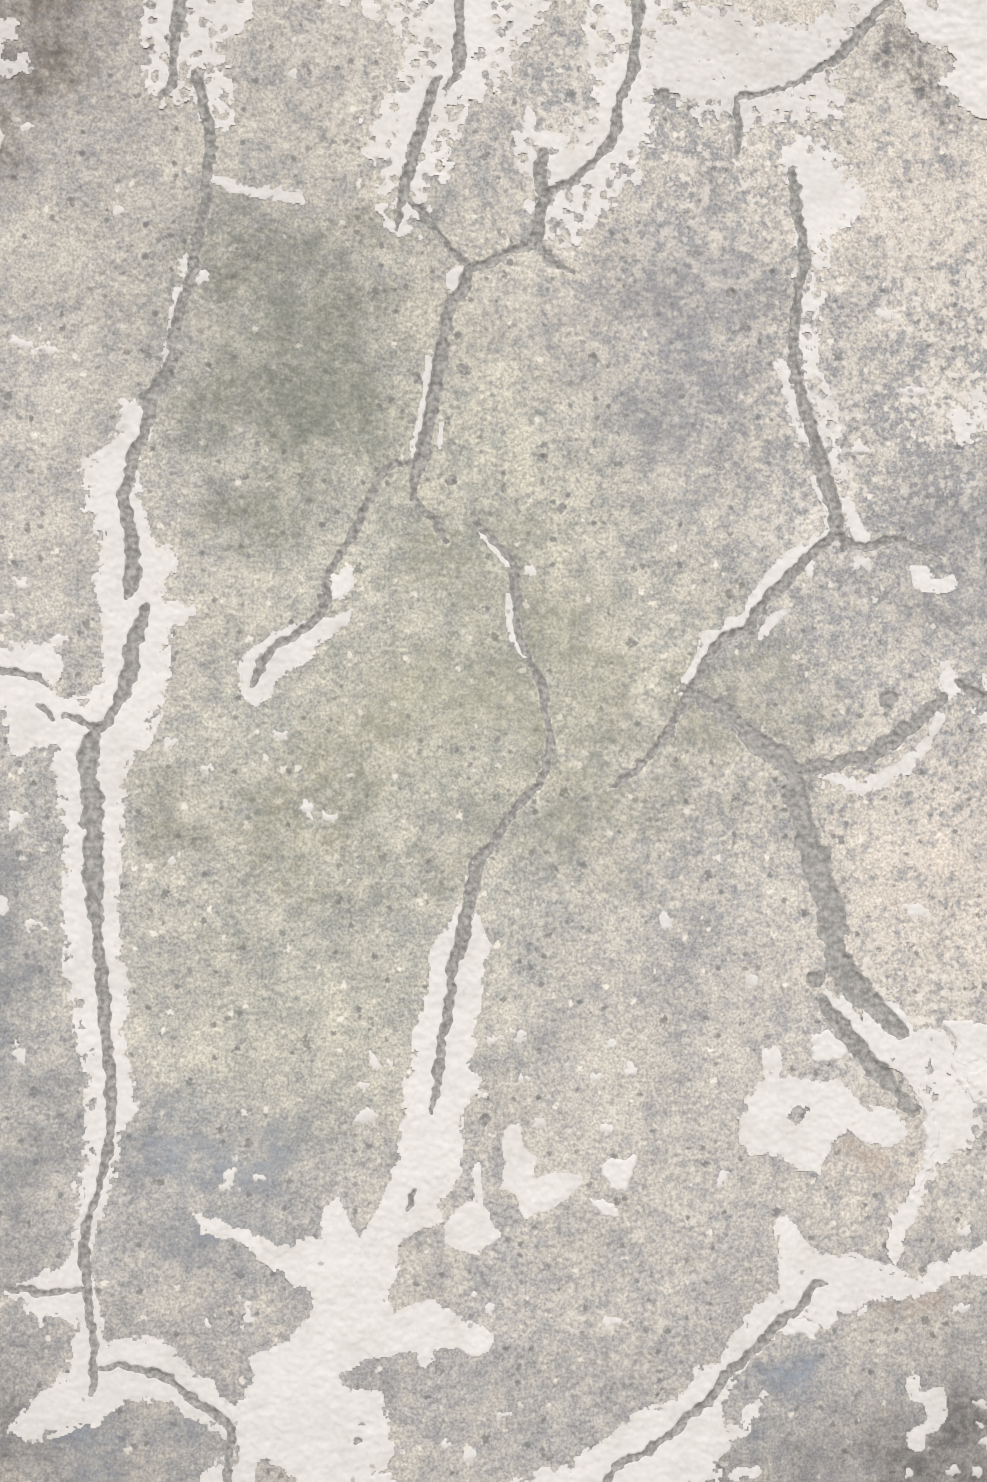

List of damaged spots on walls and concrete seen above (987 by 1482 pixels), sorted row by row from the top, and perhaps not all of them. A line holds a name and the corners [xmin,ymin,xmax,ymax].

crack [0,0,237,1482]
peeling [139,0,253,132]
peeling [209,174,305,205]
peeling [0,253,638,1482]
peeling [325,0,552,240]
crack [250,0,647,1115]
peeling [511,0,987,697]
crack [608,167,987,1118]
crack [732,0,895,157]
crack [405,1188,417,1212]
crack [603,1279,828,1482]
peeling [510,970,987,1482]